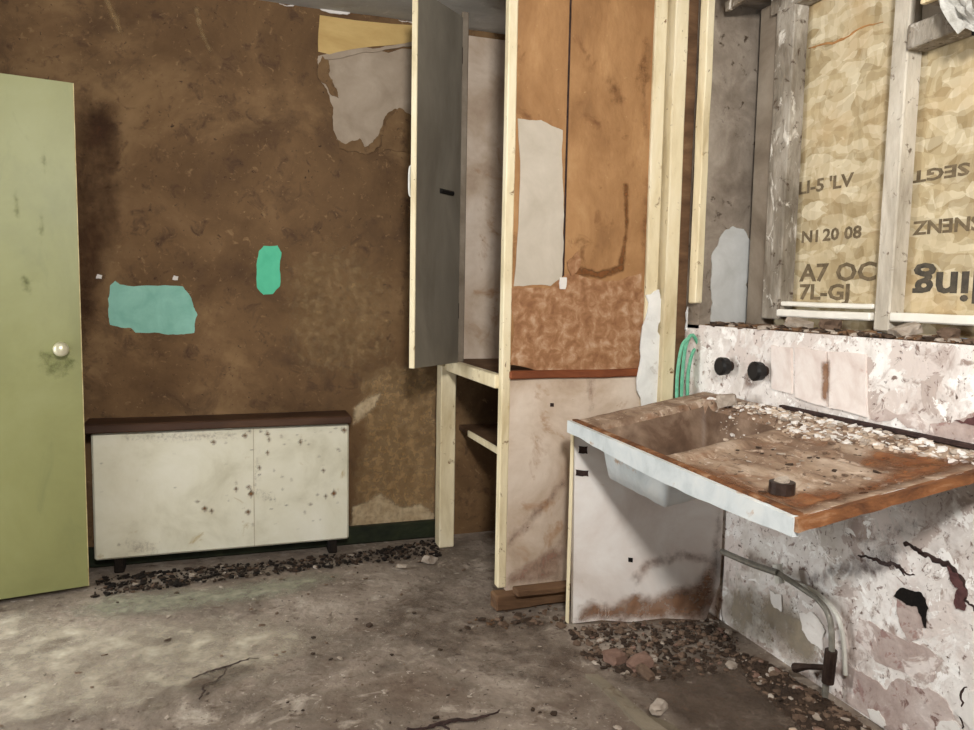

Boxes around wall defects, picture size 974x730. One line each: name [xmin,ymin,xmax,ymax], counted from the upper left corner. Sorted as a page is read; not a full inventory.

flaking render [317,9,412,155]
flaking render [710,226,750,323]
peeling [870,408,974,444]
spalling [947,566,968,611]
spalling [834,588,974,730]